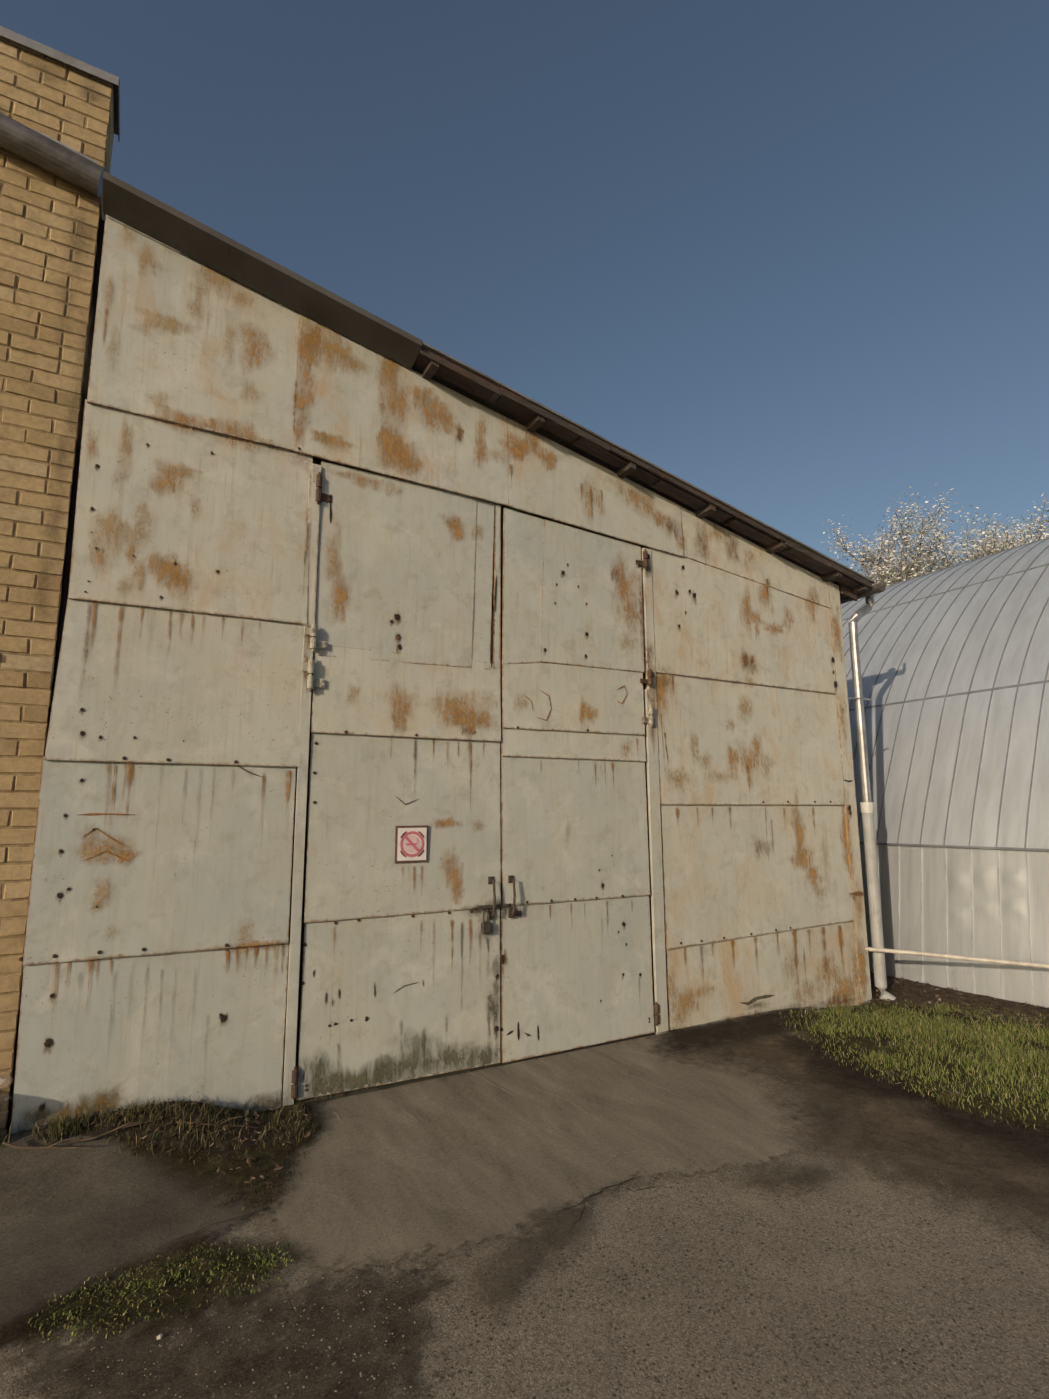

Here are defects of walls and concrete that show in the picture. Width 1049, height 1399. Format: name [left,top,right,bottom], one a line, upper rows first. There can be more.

corrosion [293,323,357,448]
corrosion [378,358,486,471]
corrosion [89,507,190,637]
corrosion [442,697,490,787]
corrosion [63,762,138,863]
corrosion [792,808,822,884]
corrosion [840,805,853,873]
corrosion [226,941,288,964]
corrosion [777,925,867,1008]
leakage [310,997,498,1103]
leakage [787,1039,1049,1164]
crack [556,1177,660,1229]